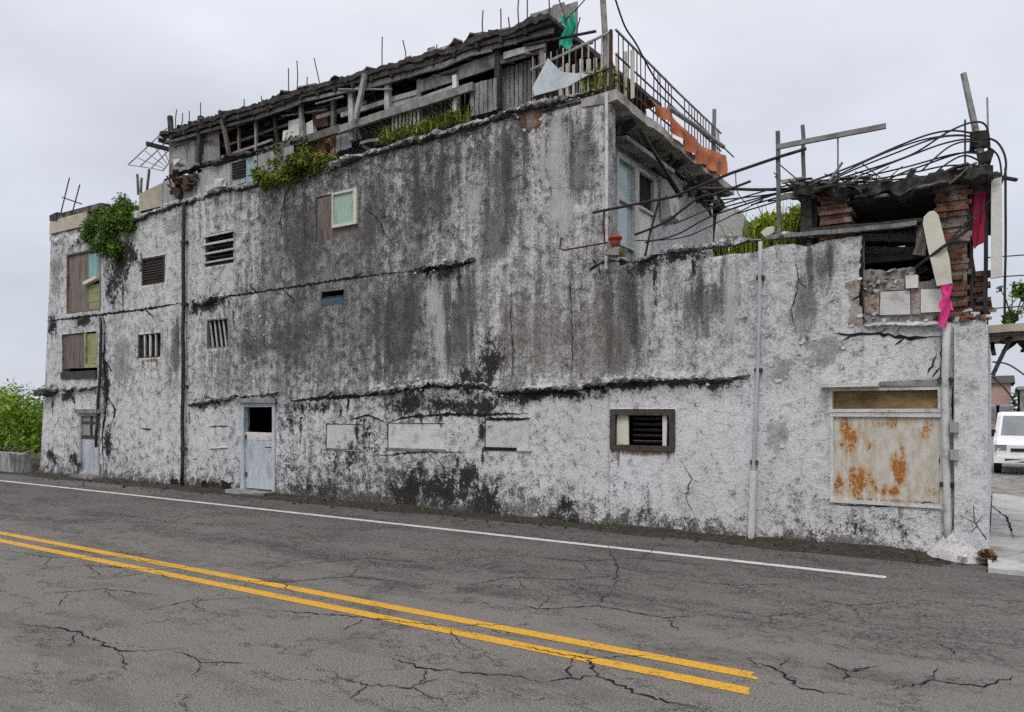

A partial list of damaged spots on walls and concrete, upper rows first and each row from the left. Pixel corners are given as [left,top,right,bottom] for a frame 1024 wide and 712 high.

damp [449,157,481,225]
damp [540,109,576,236]
damp [420,258,470,367]
damp [621,244,723,366]
crack [791,258,805,334]
peeling [845,277,887,329]
crack [836,241,953,419]
damp [101,361,115,460]
damp [280,401,380,499]
crack [291,391,528,423]
damp [379,331,666,515]
damp [681,377,751,392]